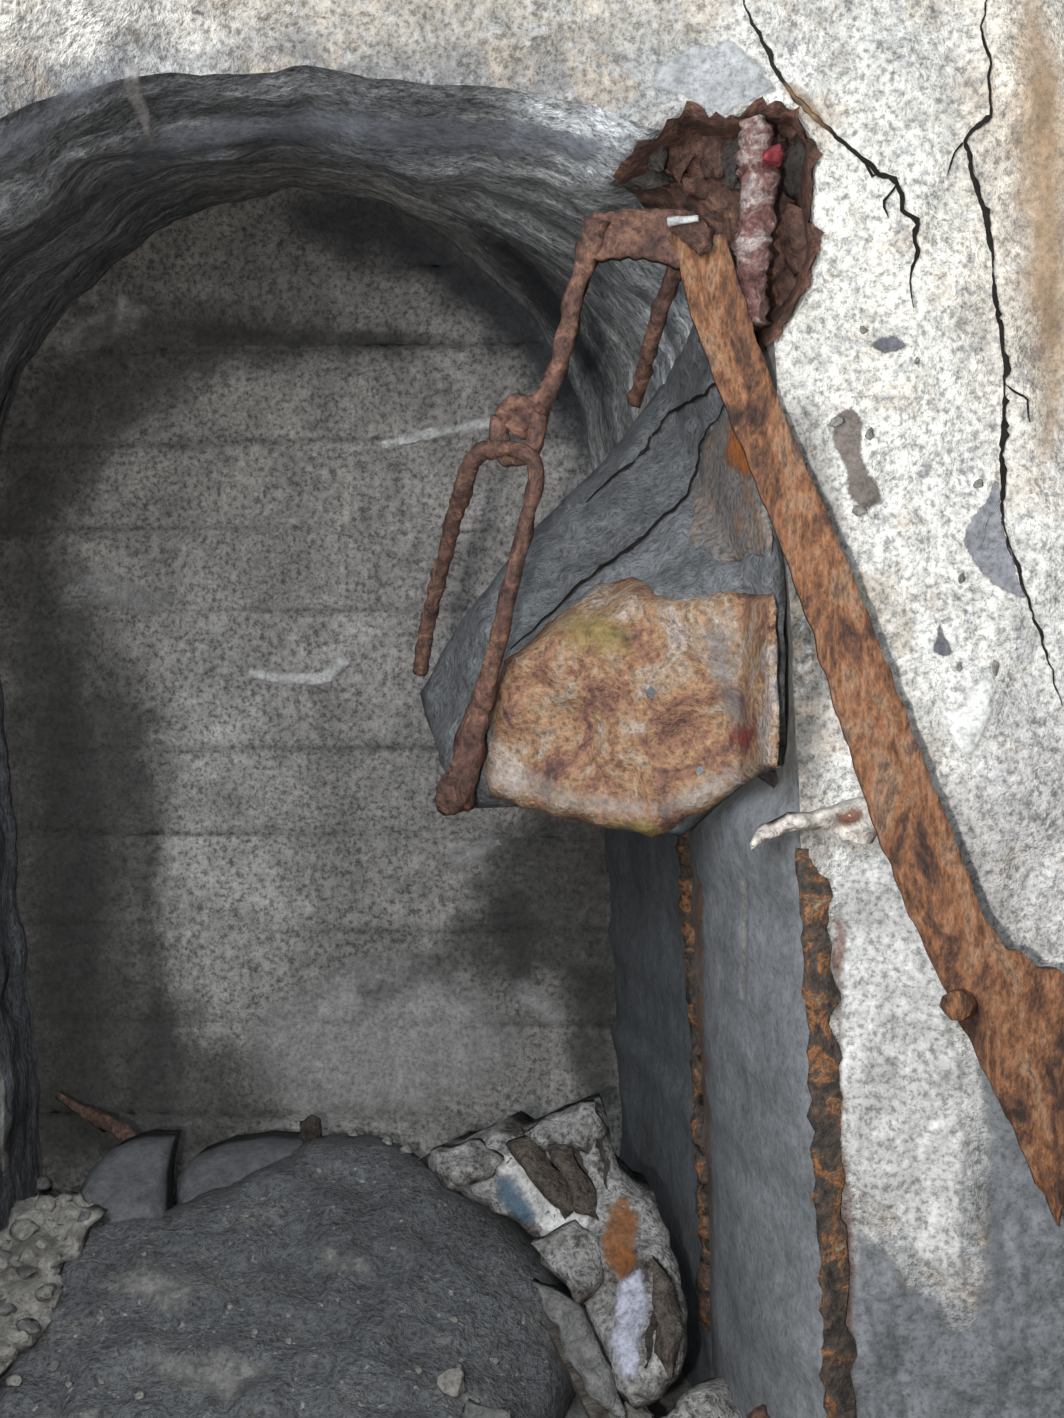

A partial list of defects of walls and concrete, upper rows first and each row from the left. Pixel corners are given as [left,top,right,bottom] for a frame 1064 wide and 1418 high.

spalling [612,40,824,349]
crack [743,0,920,308]
crack [947,0,1062,705]
rust [1021,28,1064,372]
rust [484,577,780,838]
rust [835,923,846,994]